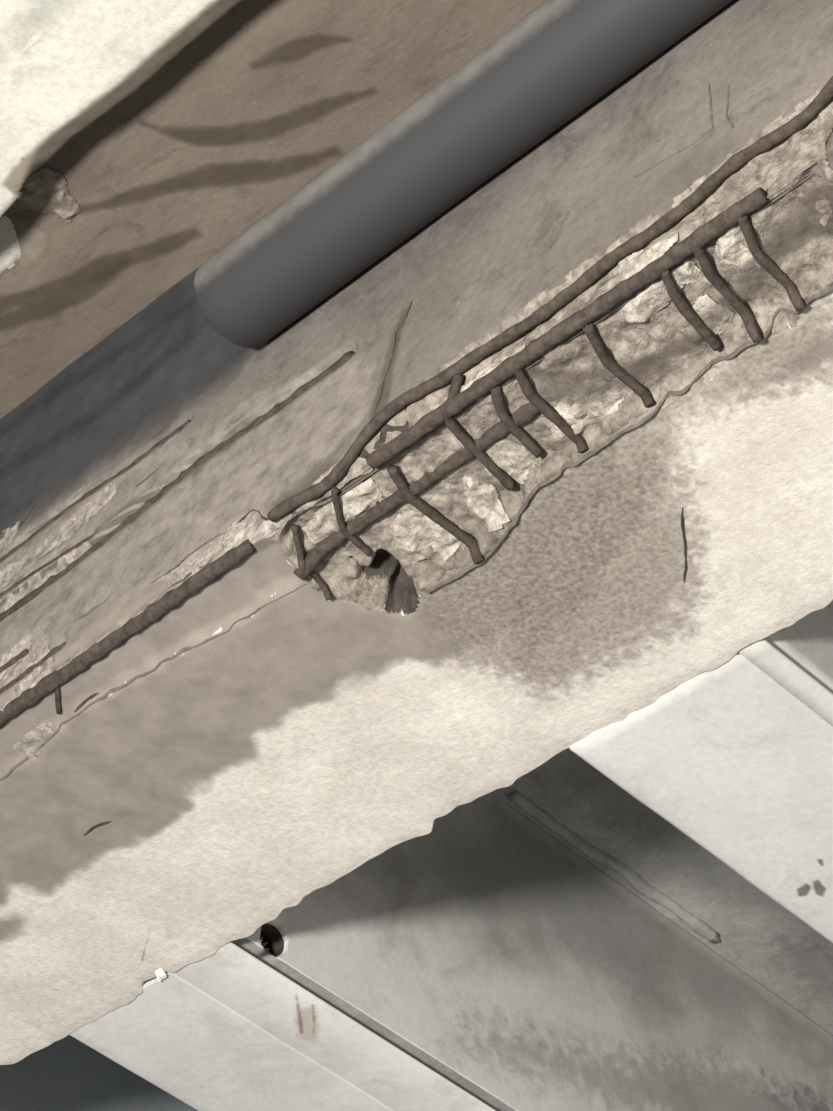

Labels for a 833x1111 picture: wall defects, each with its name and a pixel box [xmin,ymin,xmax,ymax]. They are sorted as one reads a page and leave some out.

water stain [4,0,239,195]
water stain [165,90,372,144]
water stain [257,37,341,65]
water stain [85,149,336,210]
water stain [0,231,197,329]
water stain [0,267,251,534]
spalling [0,76,833,781]
water stain [0,510,469,904]
water stain [0,920,19,939]